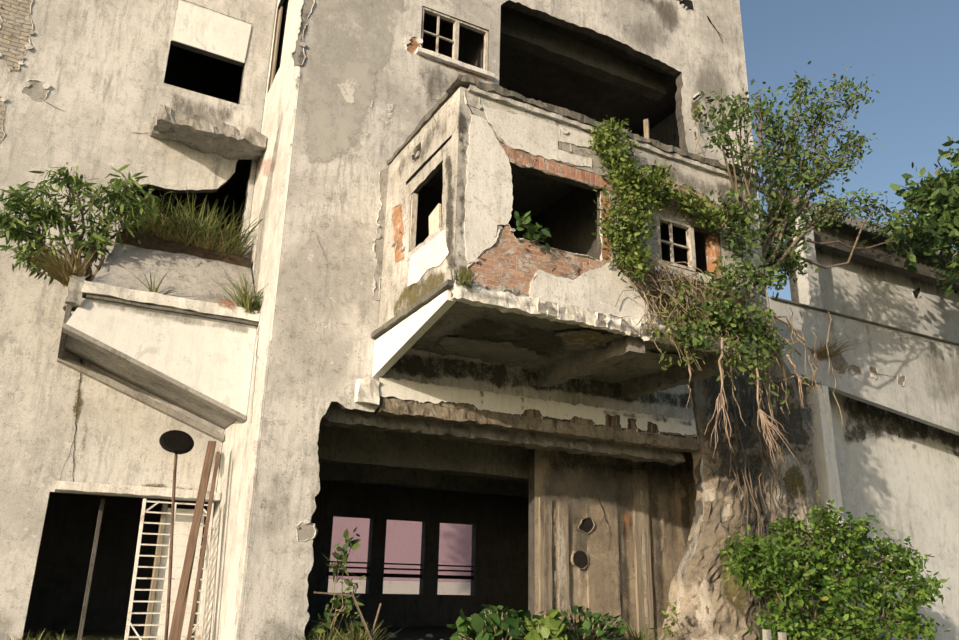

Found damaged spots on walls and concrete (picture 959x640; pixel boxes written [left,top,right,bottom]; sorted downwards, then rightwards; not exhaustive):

spalling [0,0,50,101]
peeling [291,0,423,163]
peeling [371,166,405,301]
flaking render [466,127,748,373]
crack [60,362,82,482]
spalling [439,401,475,409]
leakage [454,316,565,356]
leakage [389,354,690,417]
spalling [570,414,660,434]
spalling [830,351,878,380]
leakage [844,396,959,456]
spalling [295,519,318,542]